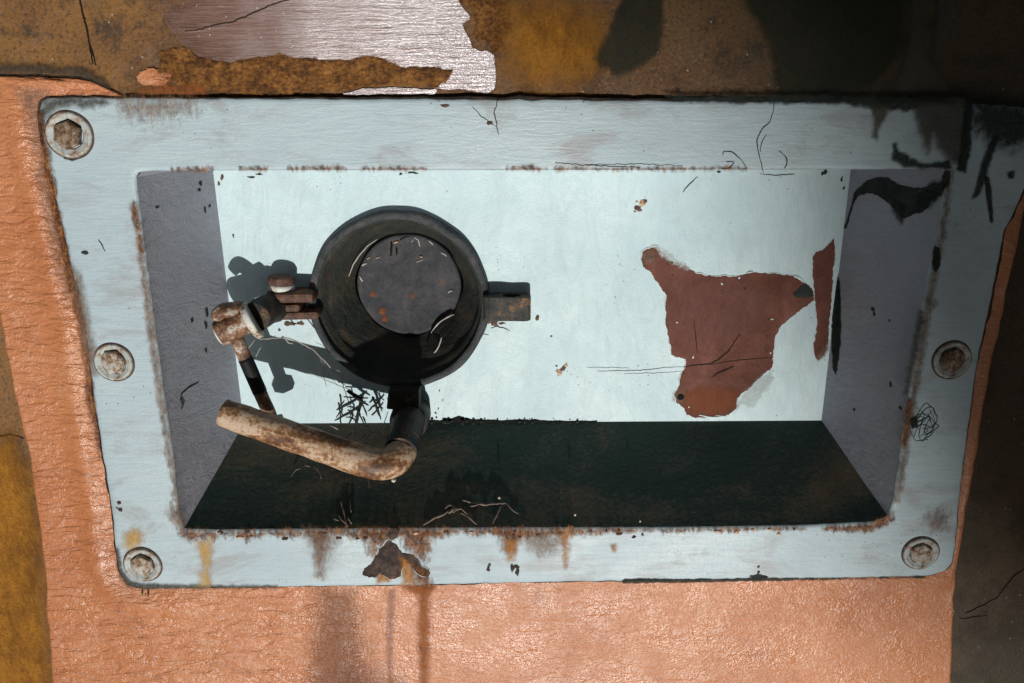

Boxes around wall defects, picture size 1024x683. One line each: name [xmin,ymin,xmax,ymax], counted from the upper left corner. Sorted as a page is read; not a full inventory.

crack [79,0,96,66]
peeling [137,68,171,86]
crack [185,0,289,32]
rust [140,48,452,97]
peeling [163,0,496,95]
rust [459,0,512,54]
peeling [641,238,836,418]
rust [895,174,953,501]
rust [131,202,803,683]
rust [126,530,141,549]
rust [825,515,895,533]